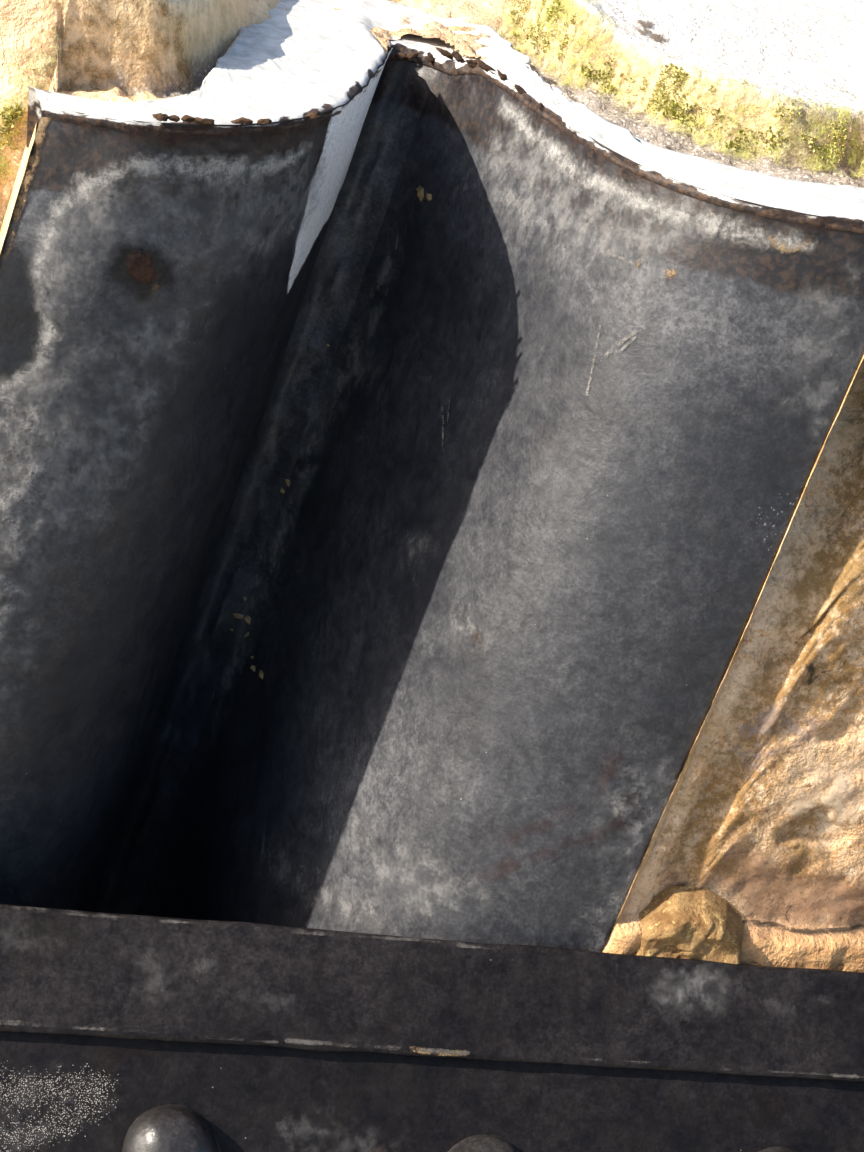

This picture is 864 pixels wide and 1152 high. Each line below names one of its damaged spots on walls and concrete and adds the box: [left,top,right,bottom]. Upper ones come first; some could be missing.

leakage [0,49,392,390]
rust [109,245,172,299]
crack [743,906,864,934]